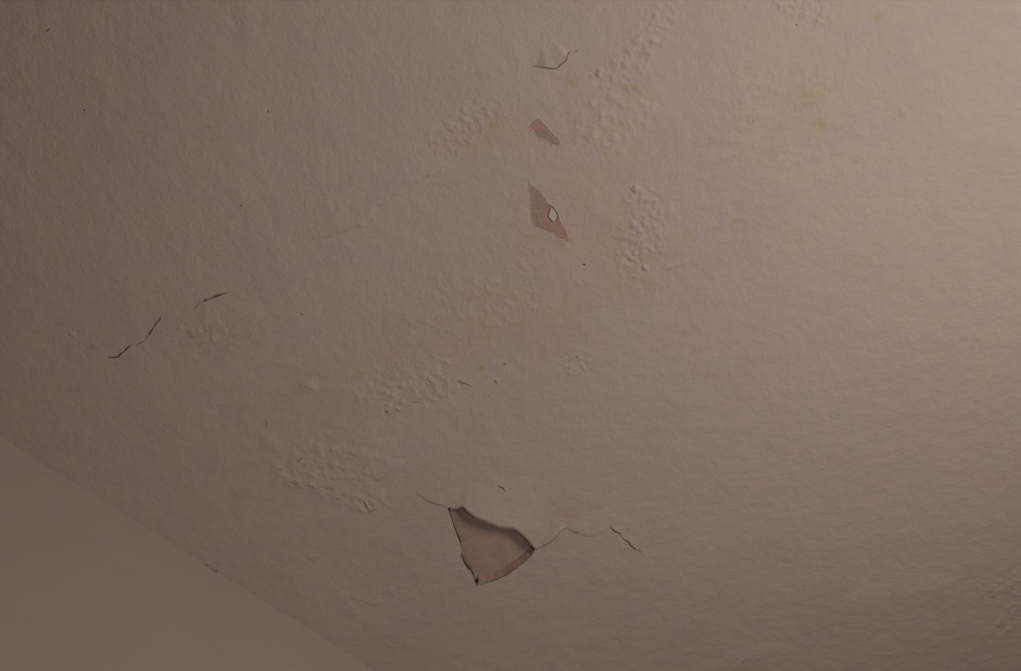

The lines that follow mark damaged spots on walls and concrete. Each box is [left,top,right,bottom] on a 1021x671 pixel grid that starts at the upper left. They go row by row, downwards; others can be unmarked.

peeling [528,118,561,147]
peeling [528,178,570,242]
crack [109,316,161,358]
flaking render [449,507,534,585]
crack [610,526,643,554]